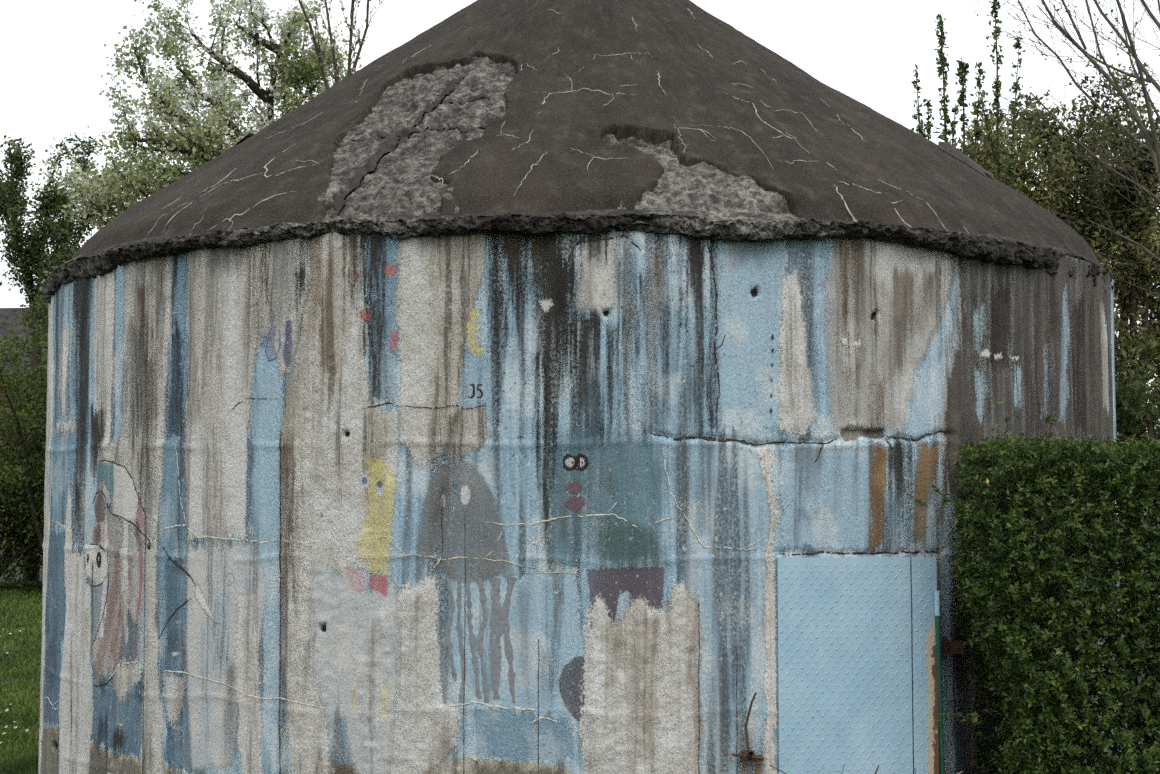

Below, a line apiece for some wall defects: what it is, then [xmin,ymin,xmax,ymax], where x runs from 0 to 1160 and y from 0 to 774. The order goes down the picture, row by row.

crack [147,113,321,235]
crack [425,8,969,233]
spalling [603,134,796,224]
leakage [72,269,105,536]
peeling [58,254,187,774]
peeling [183,56,517,774]
leakage [488,231,717,529]
crack [337,235,958,774]
corrosion [868,439,889,552]
corrosion [914,440,948,541]
leakage [943,256,1117,774]
peeling [576,580,705,774]